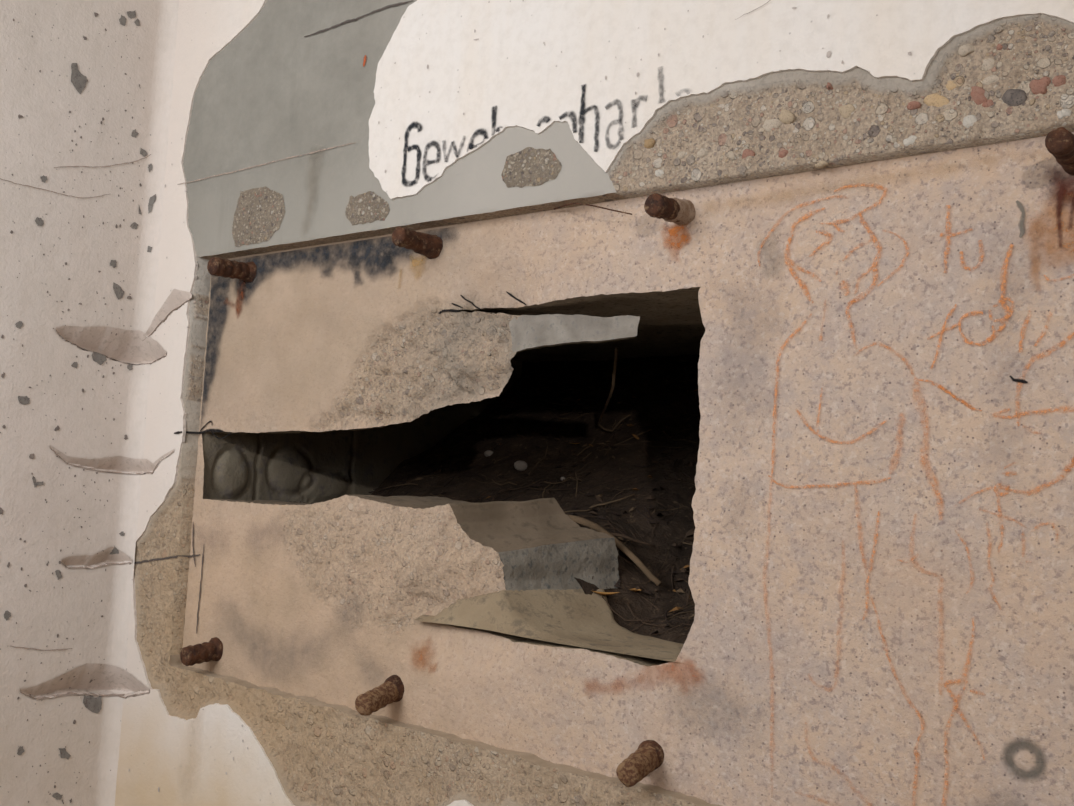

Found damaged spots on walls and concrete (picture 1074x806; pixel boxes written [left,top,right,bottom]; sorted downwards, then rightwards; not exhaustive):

spalling [958,44,975,56]
spalling [1029,76,1051,95]
spalling [779,109,795,124]
spalling [838,104,855,118]
spalling [907,101,921,110]
spalling [923,93,949,107]
spalling [970,86,988,105]
spalling [1002,89,1027,106]
spalling [1057,109,1071,119]
peeling [183,0,616,257]
rust [1044,172,1074,253]
rust [667,225,689,248]